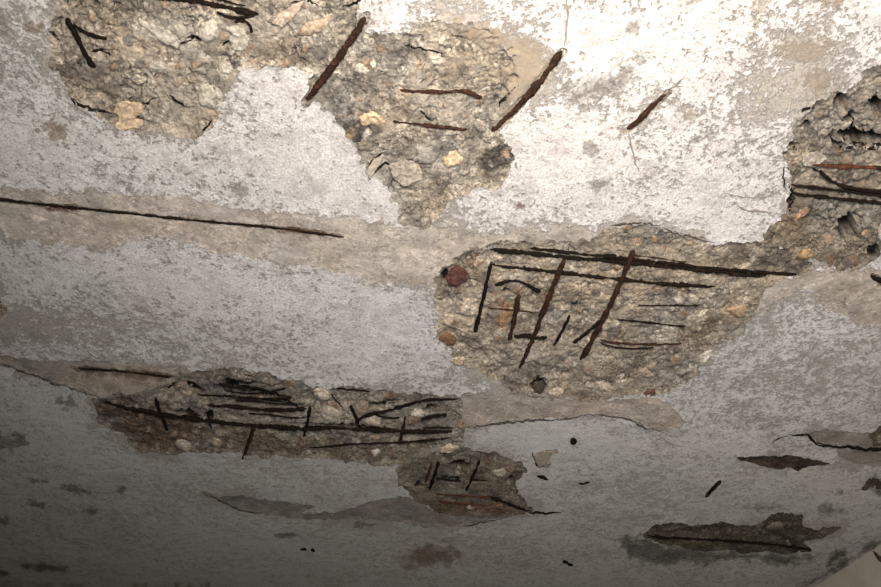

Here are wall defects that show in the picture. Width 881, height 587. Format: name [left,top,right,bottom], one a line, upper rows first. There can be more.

spalling [0,0,881,403]
spalling [0,355,559,528]
spalling [736,455,830,472]
crack [773,434,881,452]
peeling [809,426,881,466]
spalling [862,478,881,491]
spalling [643,512,841,555]